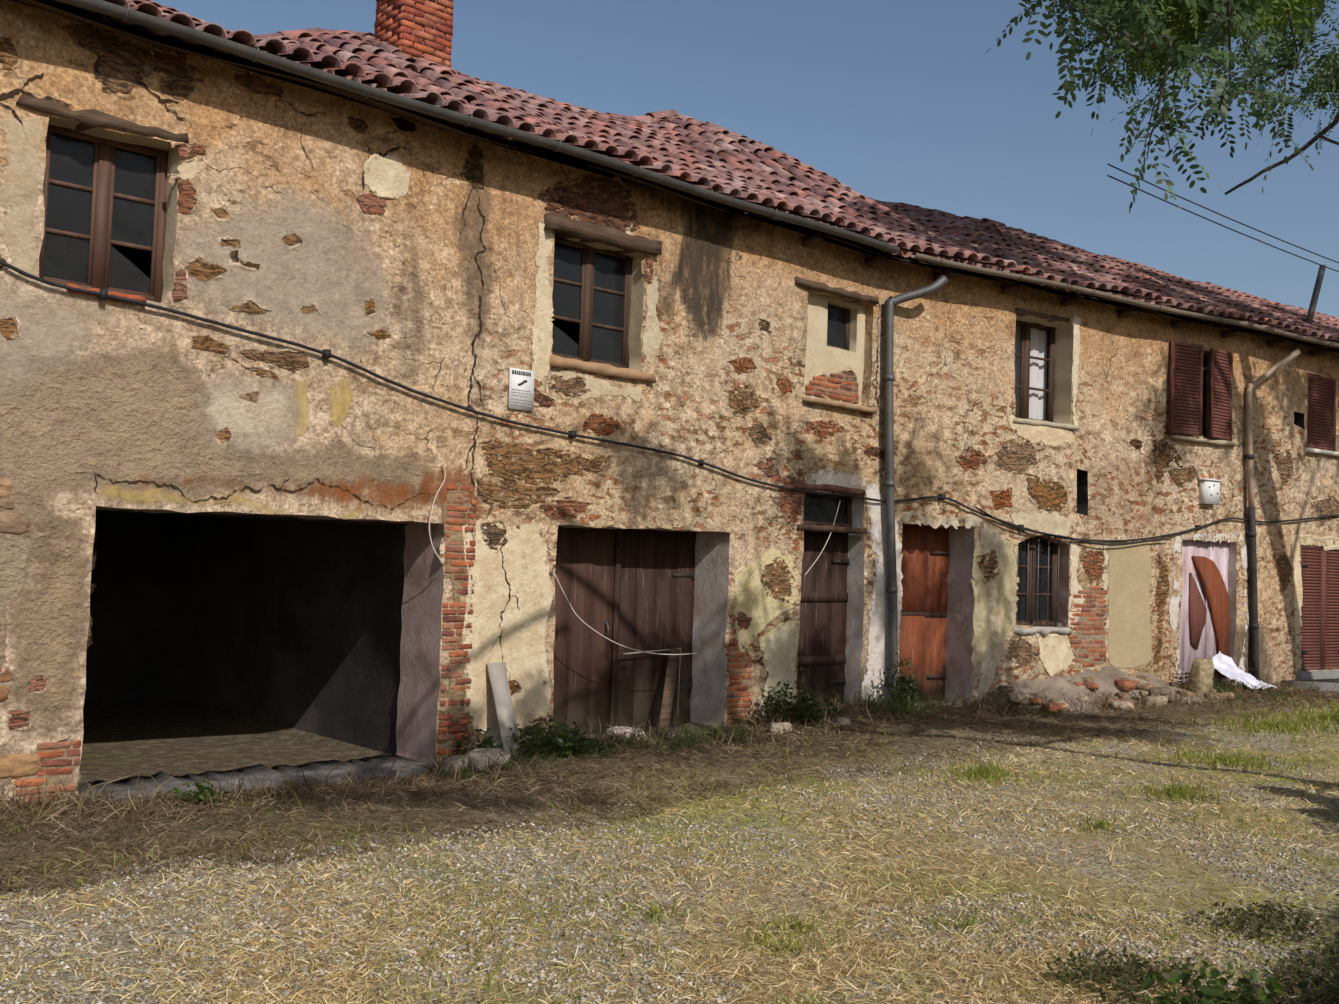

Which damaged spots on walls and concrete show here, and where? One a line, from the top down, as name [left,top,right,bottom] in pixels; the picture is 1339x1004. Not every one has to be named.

crack [0,72,76,125]
spalling [56,24,205,108]
crack [77,40,192,126]
damp [613,177,759,338]
crack [76,472,428,509]
crack [459,139,519,679]
spalling [725,357,808,532]
flaking render [776,367,860,404]
spalling [956,438,1070,514]
flaking render [0,477,81,804]
flaking render [724,556,796,727]
flaking render [1006,546,1109,677]